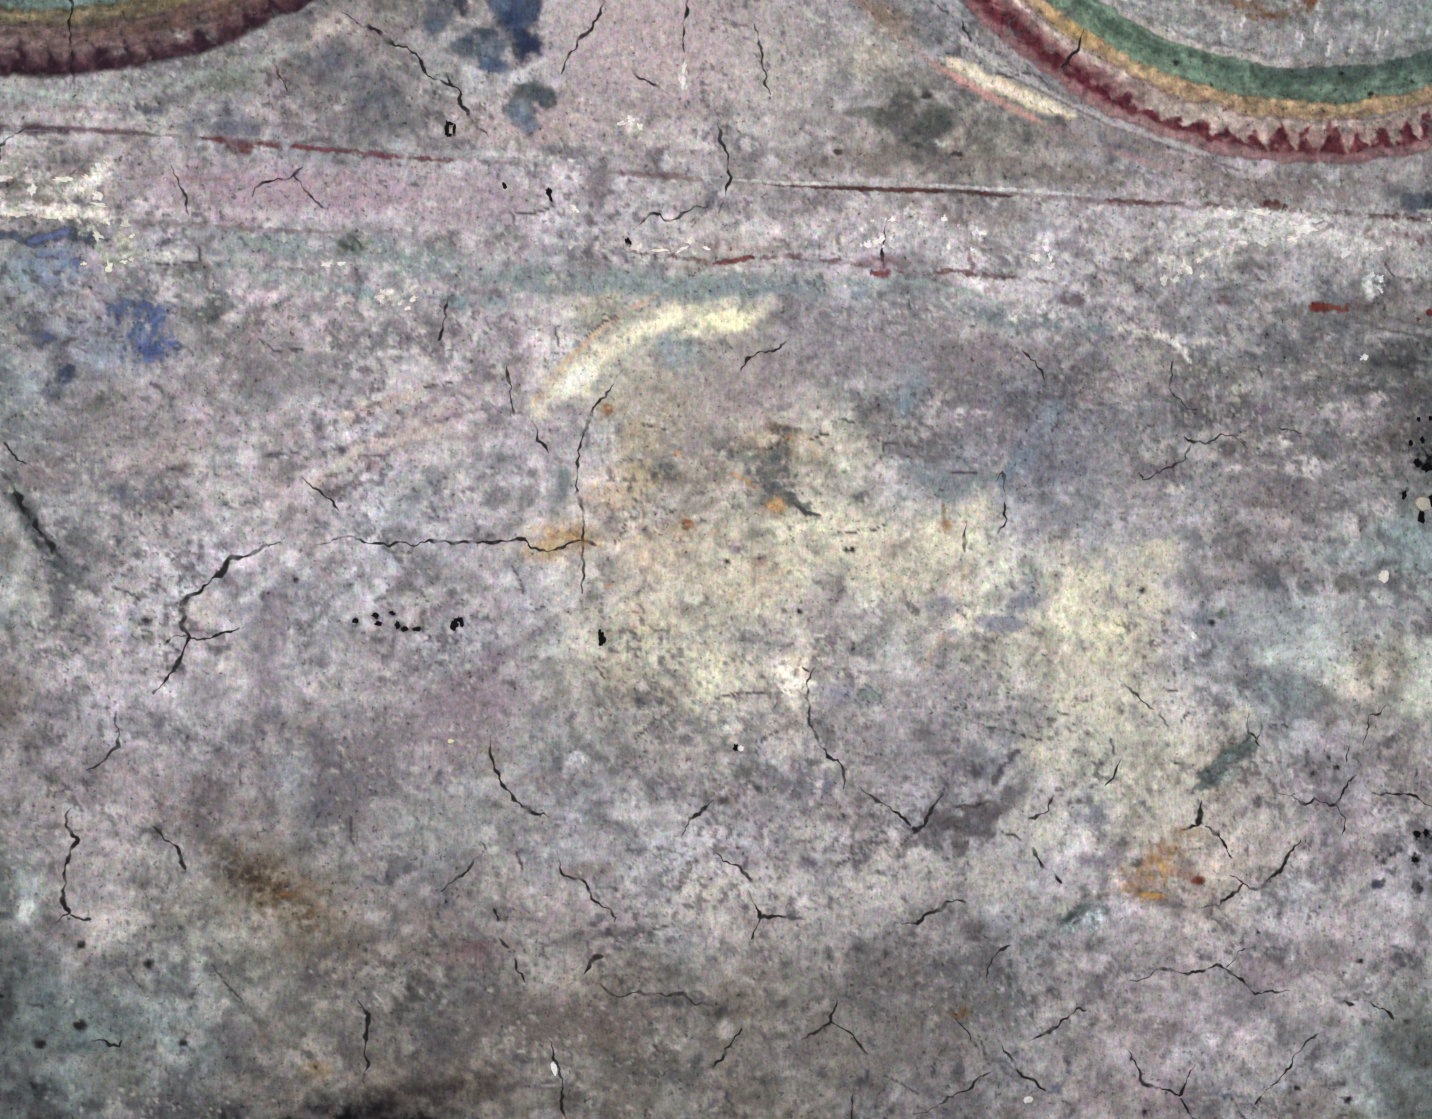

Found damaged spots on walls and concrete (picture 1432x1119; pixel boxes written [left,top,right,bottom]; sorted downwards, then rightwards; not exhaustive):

crack [343,12,487,133]
crack [561,7,602,74]
crack [304,368,614,593]
water stain [1409,416,1432,473]
crack [152,542,280,694]
crack [489,744,546,816]
crack [803,667,942,833]
crack [1189,706,1428,907]
crack [718,854,785,939]
water stain [1372,829,1432,893]
water stain [326,1082,463,1119]
crack [922,1007,1086,1113]